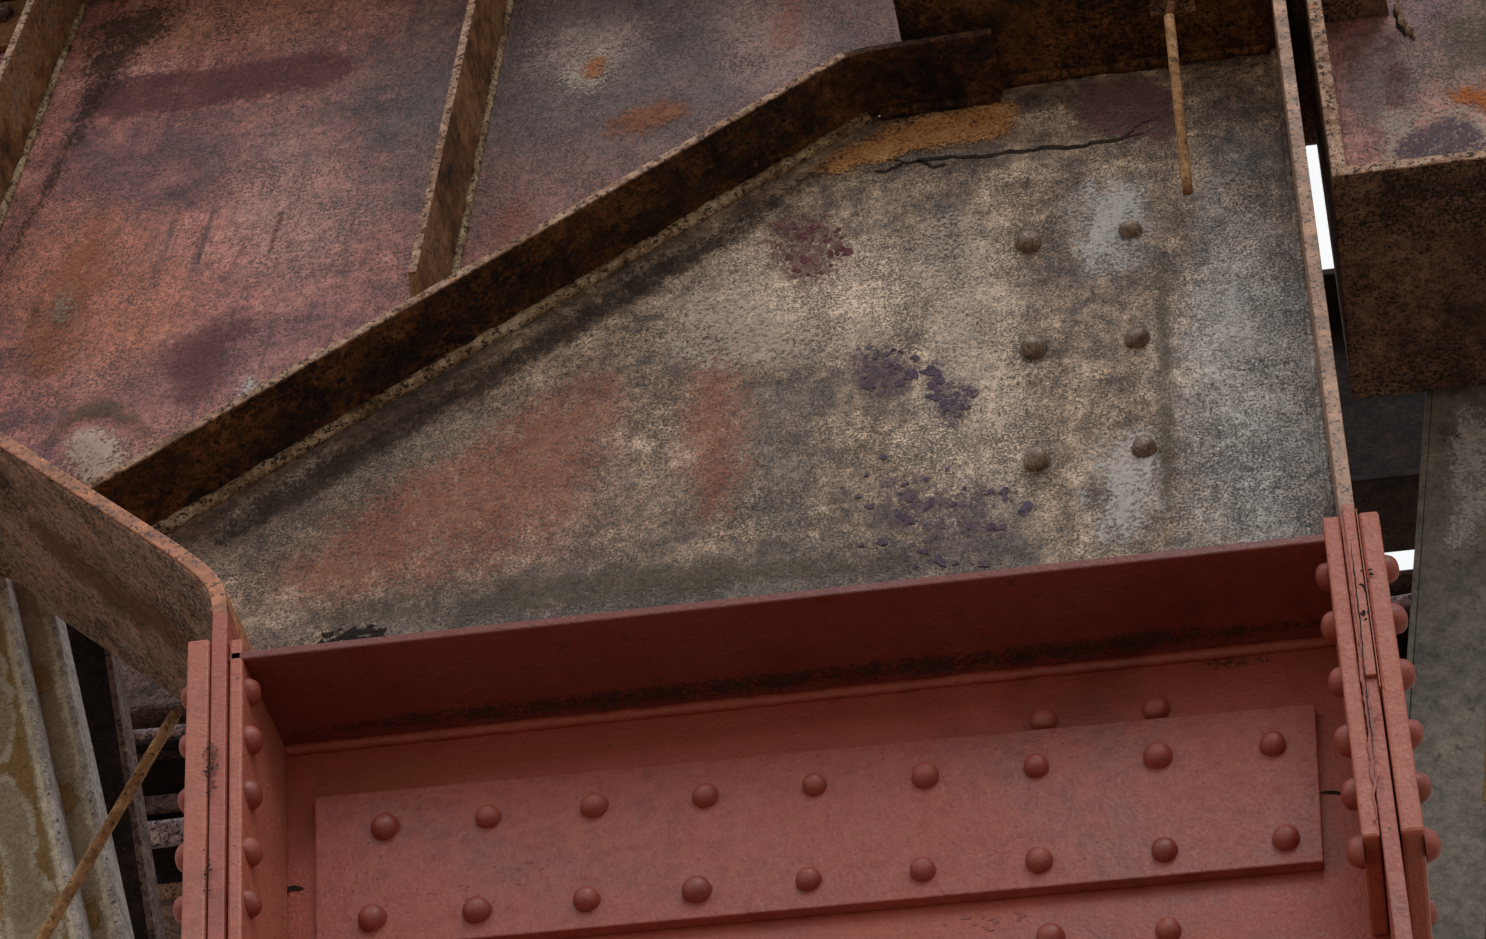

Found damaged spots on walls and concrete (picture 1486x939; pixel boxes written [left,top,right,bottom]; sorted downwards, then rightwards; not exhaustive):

leakage [562,49,610,91]
rust [606,100,690,138]
rust [803,98,1020,176]
crack [874,120,1155,173]
rust [1380,78,1486,160]
peeling [764,214,853,284]
peeling [850,345,980,424]
peeling [854,466,1033,569]